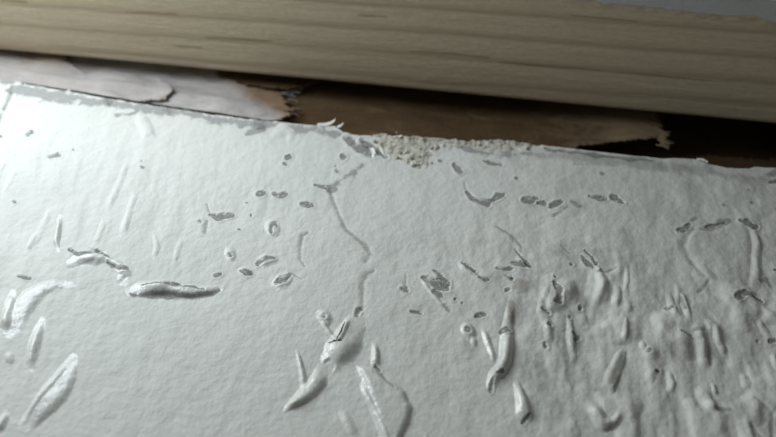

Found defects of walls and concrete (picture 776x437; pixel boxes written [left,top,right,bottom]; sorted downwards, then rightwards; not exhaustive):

peeling [267,122,296,166]
flaking render [335,132,532,175]
crack [325,164,363,193]
peeling [466,191,505,207]
peeling [522,196,581,217]
peeling [264,219,281,238]
peeling [224,245,295,291]
peeling [418,270,463,312]
peeling [456,258,490,284]
peeling [496,250,532,292]
peeling [536,249,610,371]